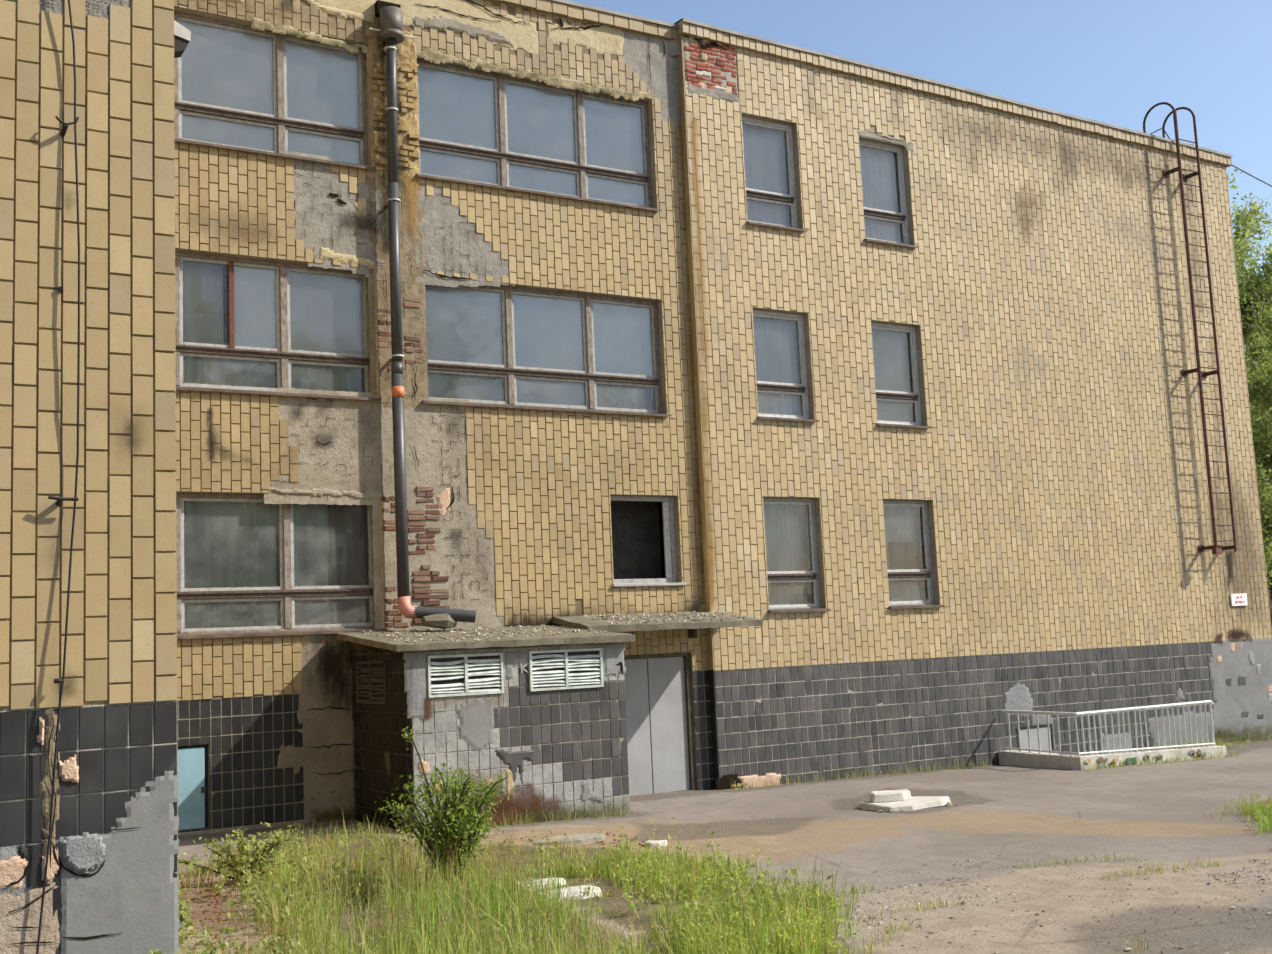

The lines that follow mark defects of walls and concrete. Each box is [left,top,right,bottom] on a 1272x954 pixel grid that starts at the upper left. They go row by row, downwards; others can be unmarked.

flaking render [14,0,132,34]
spalling [264,0,739,631]
peeling [278,629,358,823]
peeling [418,760,443,796]
peeling [456,697,534,796]
peeling [1209,638,1272,743]